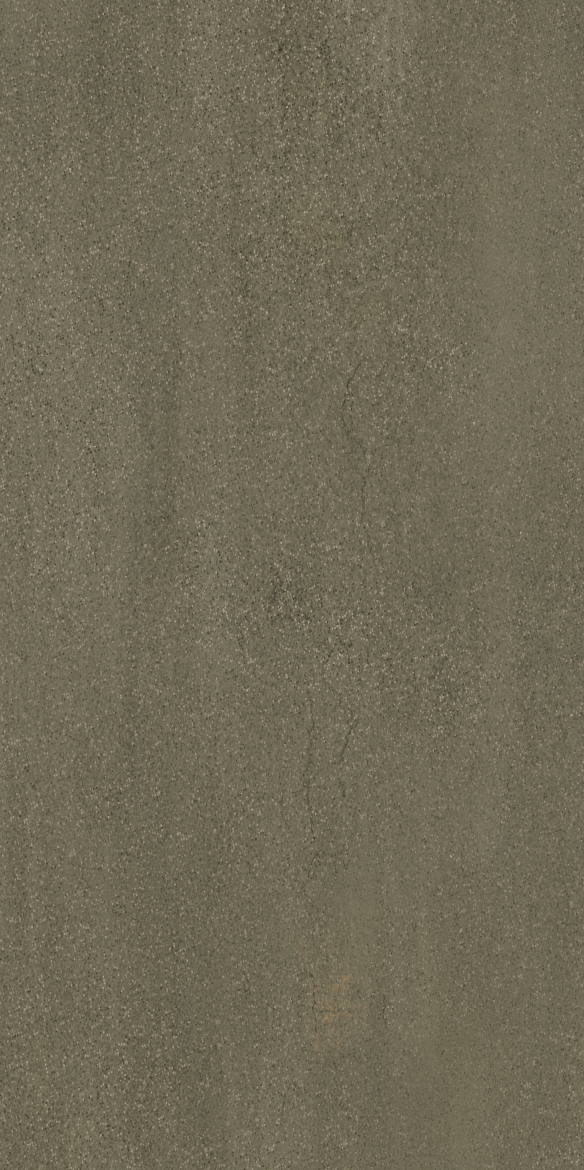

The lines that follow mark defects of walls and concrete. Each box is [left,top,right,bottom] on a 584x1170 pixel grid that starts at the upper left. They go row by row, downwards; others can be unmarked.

crack [284,102,396,313]
crack [339,358,378,560]
crack [279,636,362,903]